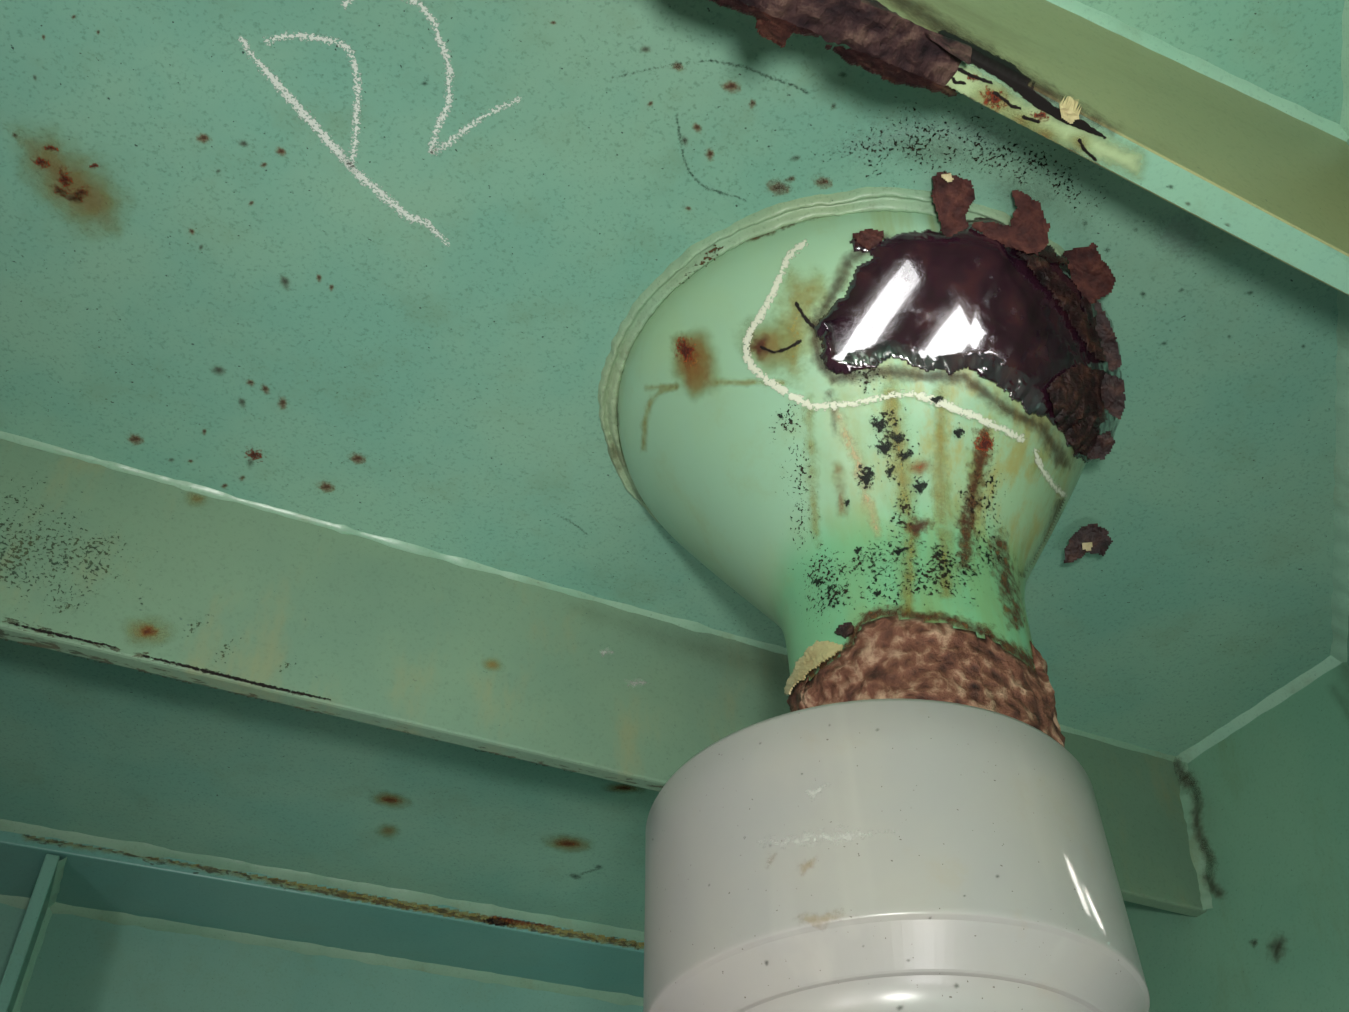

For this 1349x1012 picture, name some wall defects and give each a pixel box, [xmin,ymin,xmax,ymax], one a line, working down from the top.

peeling [894,0,1142,175]
corrosion [30,145,111,216]
corrosion [679,240,723,284]
corrosion [665,337,717,393]
corrosion [709,0,1126,748]
corrosion [555,839,580,848]
corrosion [483,915,554,928]